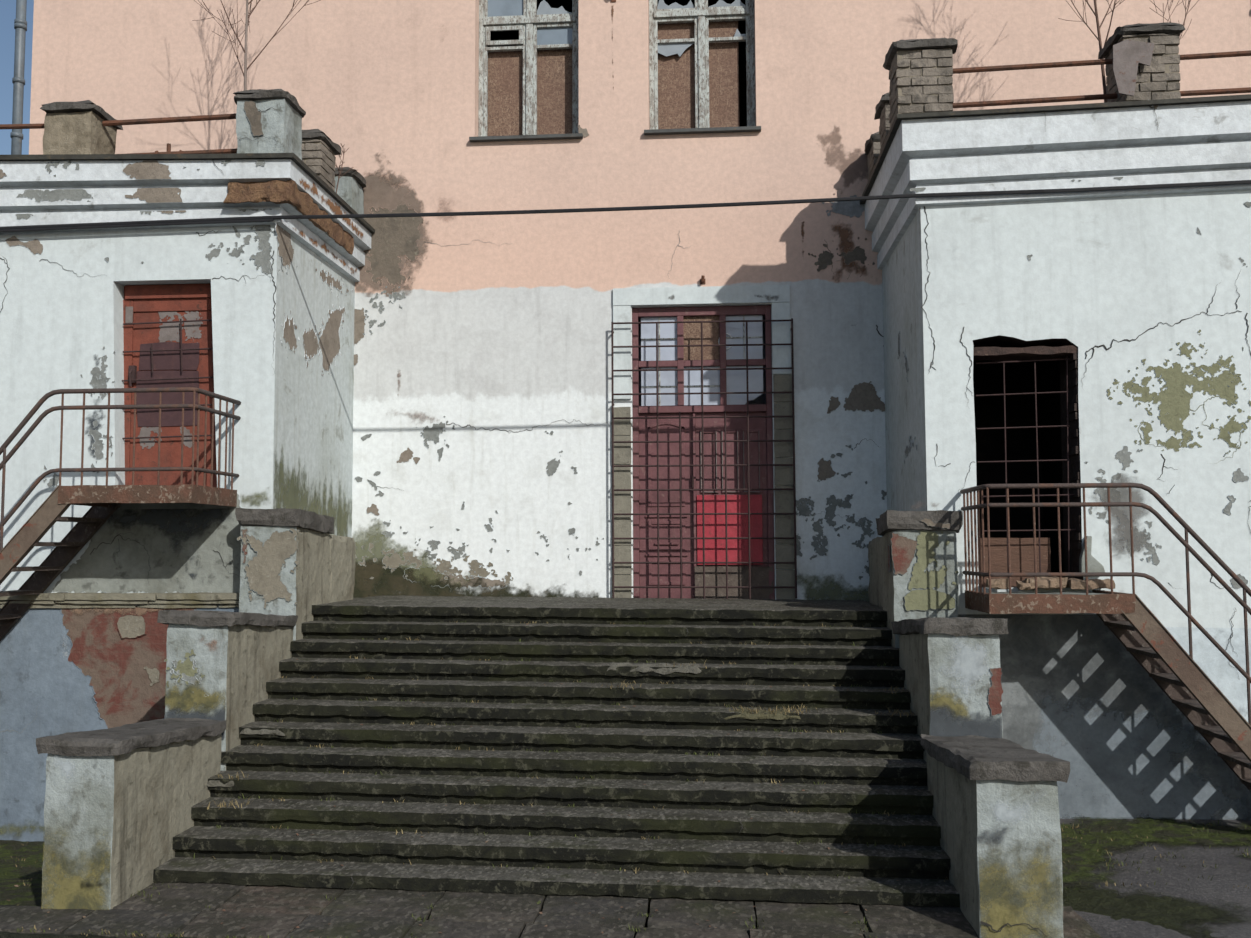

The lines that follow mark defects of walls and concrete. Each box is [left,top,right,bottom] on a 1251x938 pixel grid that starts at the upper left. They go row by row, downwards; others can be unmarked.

peeling [122,160,199,215]
peeling [205,209,298,275]
peeling [280,200,424,377]
water stain [356,155,429,297]
crack [1081,275,1251,384]
peeling [396,416,455,464]
crack [1138,421,1183,494]
peeling [1085,330,1251,565]
crack [1188,372,1241,461]
flaking render [52,493,301,729]
flaking render [355,471,513,590]
water stain [353,560,599,598]